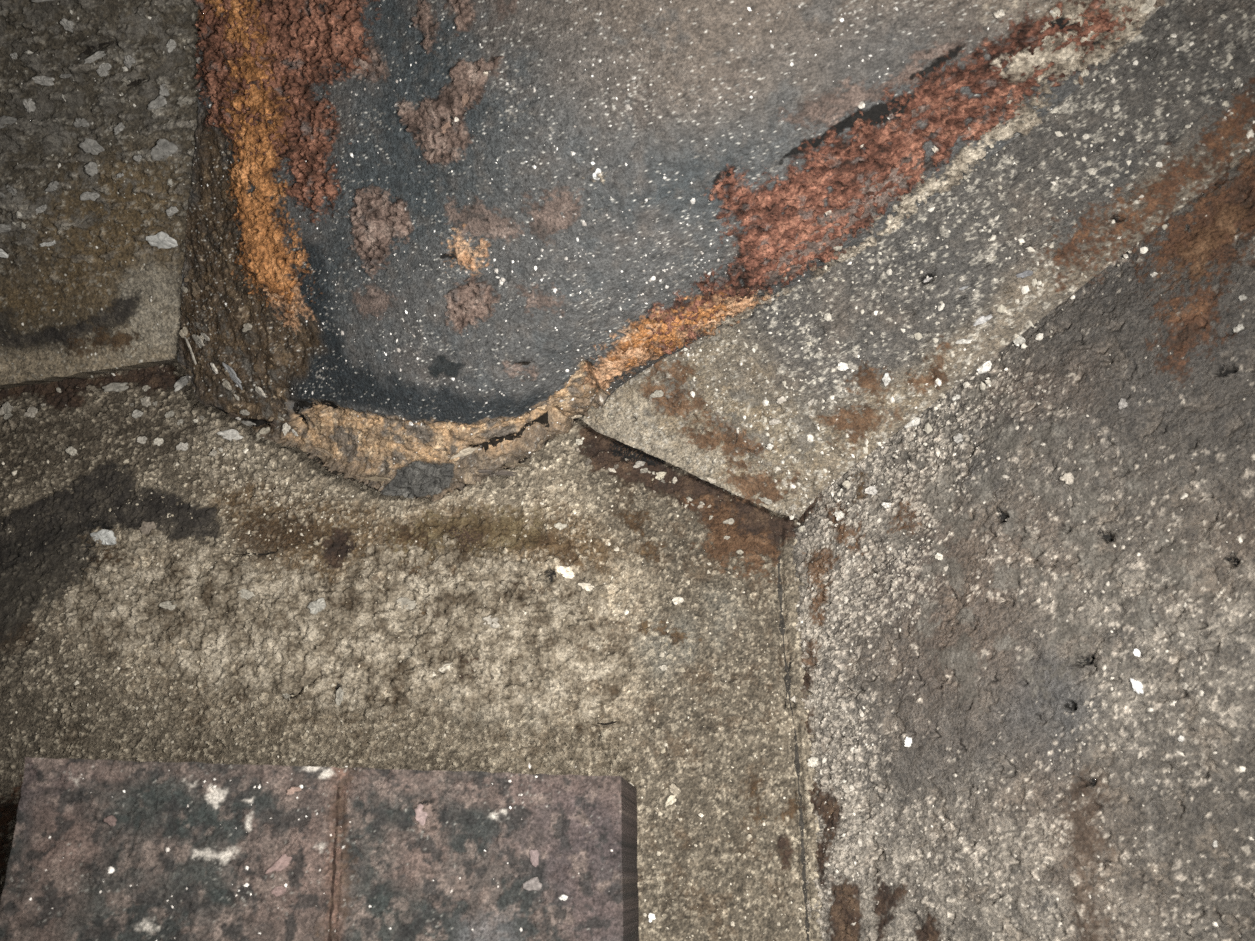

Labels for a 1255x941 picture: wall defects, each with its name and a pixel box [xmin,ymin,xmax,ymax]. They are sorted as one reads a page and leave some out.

corrosion [194,0,379,332]
corrosion [440,224,490,275]
corrosion [583,0,1143,395]
corrosion [1046,79,1255,381]
leakage [0,460,221,642]
corrosion [575,426,797,577]